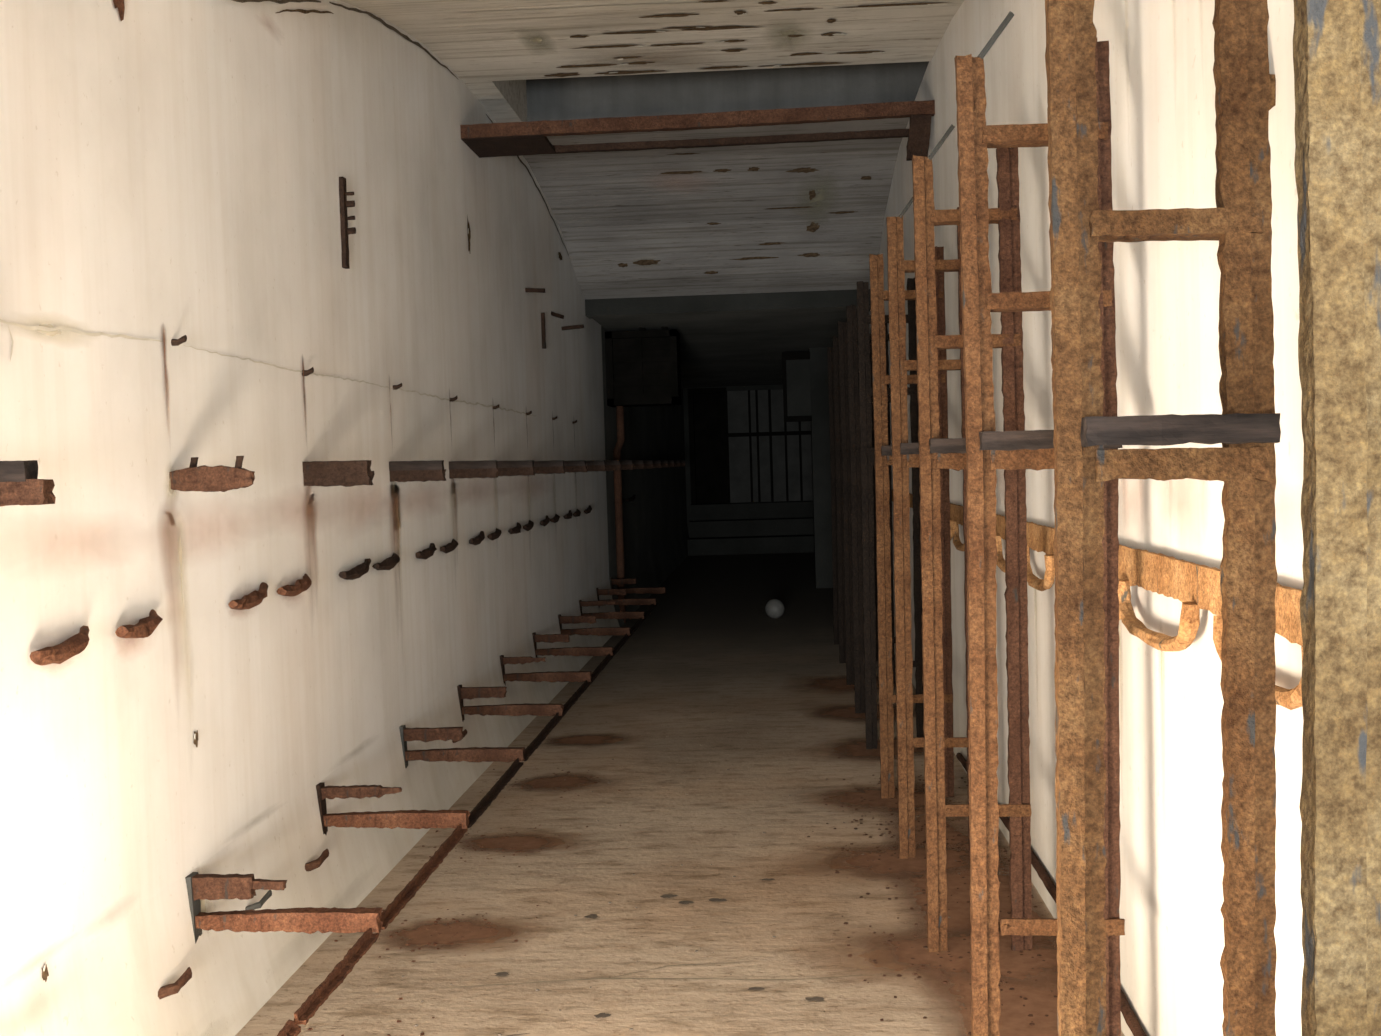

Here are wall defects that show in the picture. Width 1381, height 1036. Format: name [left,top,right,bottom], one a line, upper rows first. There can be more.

crack [232,0,458,79]
crack [517,156,568,253]
crack [0,319,536,416]
rust [803,677,896,720]
rust [551,735,628,745]
rust [822,739,897,759]
rust [518,776,600,790]
rust [466,834,572,851]
rust [815,784,972,1036]
rust [390,920,519,947]
rust [997,847,1059,1036]